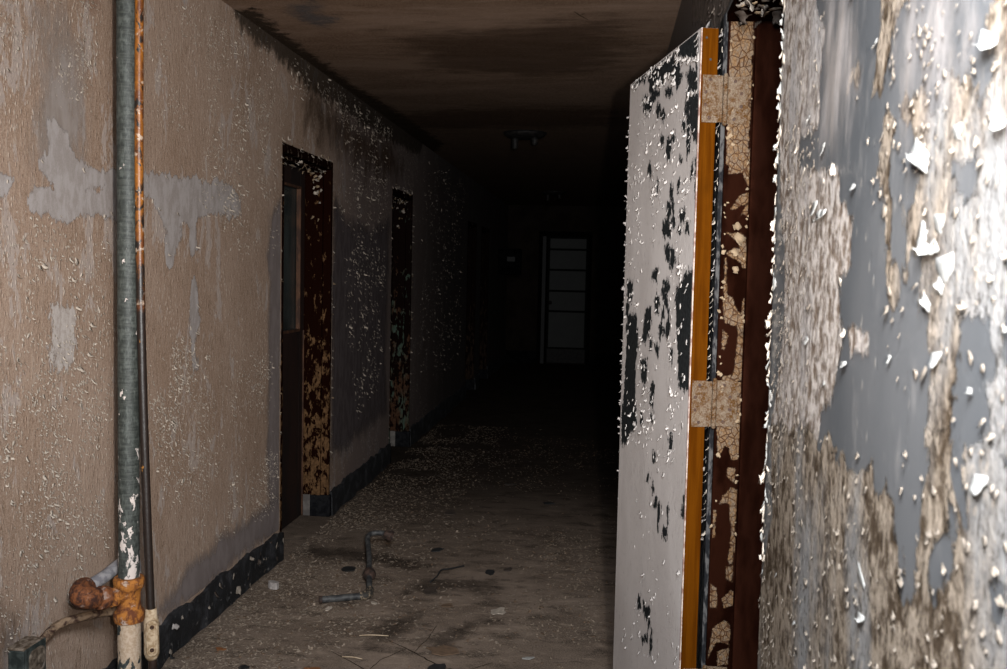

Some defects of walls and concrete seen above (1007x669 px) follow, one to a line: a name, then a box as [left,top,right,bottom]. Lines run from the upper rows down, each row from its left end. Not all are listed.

peeling [144,5,413,418]
peeling [617,0,1007,669]